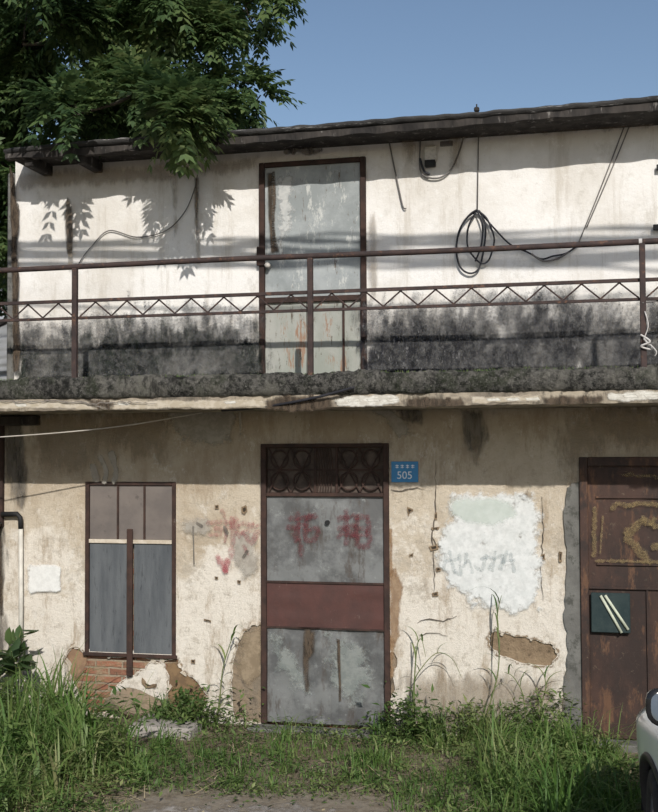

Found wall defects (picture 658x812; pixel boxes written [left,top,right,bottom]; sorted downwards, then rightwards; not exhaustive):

leakage [10,303,262,378]
leakage [361,286,658,373]
leakage [407,397,488,452]
crack [391,473,441,590]
spalling [64,644,208,714]
spalling [229,622,279,724]
peeling [276,649,307,694]
corrosion [303,629,314,691]
spalling [486,629,560,668]